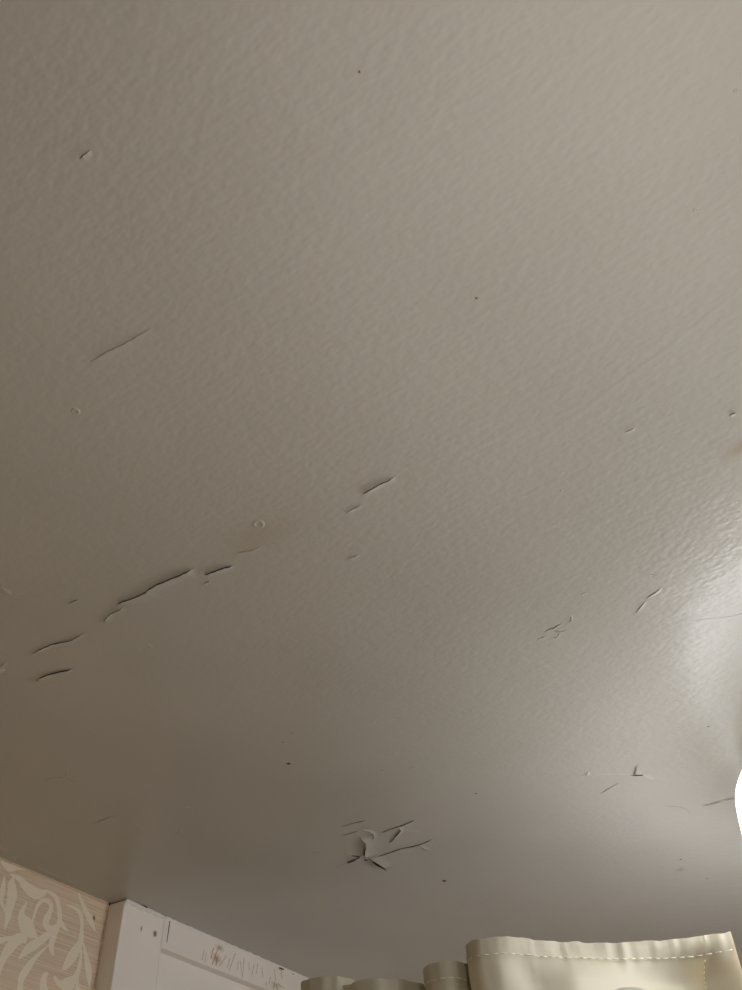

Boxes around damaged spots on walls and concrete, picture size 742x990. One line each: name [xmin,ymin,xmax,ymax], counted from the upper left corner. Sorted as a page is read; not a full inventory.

peeling [340,819,435,871]